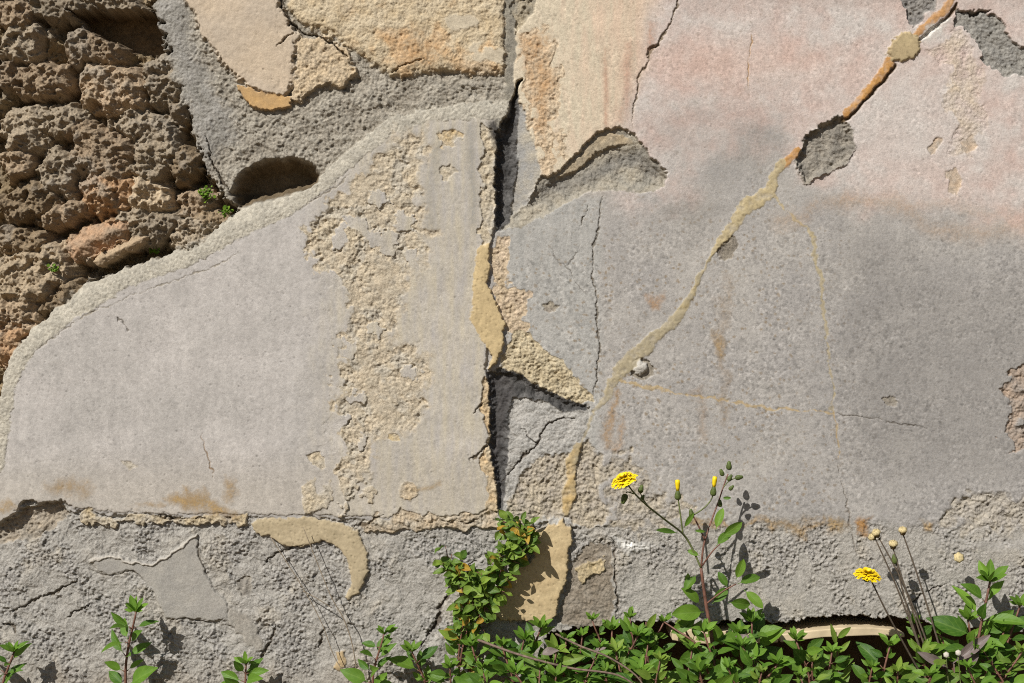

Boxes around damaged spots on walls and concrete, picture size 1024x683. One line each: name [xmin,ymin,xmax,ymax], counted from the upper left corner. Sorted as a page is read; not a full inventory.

crack [632,0,679,114]
crack [841,57,897,124]
crack [914,0,991,42]
crack [493,80,523,231]
flaking render [300,124,698,542]
crack [440,147,925,557]
flaking render [995,364,1024,453]
flaking render [80,508,249,528]
crack [354,515,384,527]
flaking render [939,489,1024,539]
spalling [430,585,486,683]
spalling [545,542,1024,683]